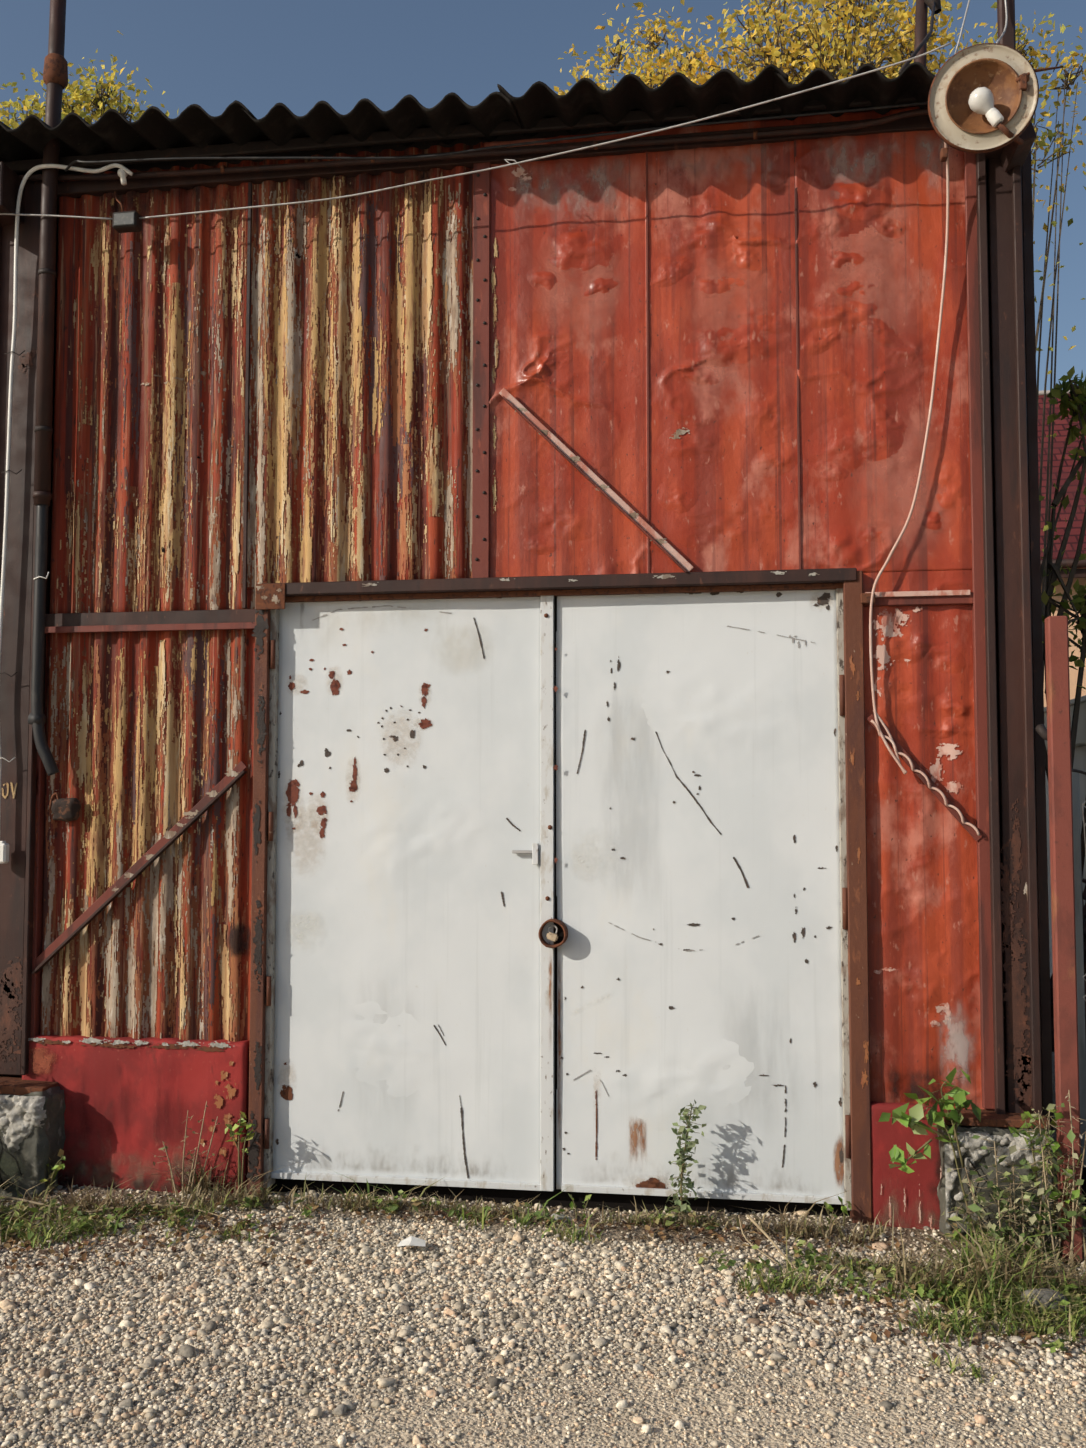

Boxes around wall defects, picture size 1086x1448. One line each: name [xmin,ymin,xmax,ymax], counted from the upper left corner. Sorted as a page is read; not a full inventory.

peeling [491,238,499,384]
peeling [57,168,473,613]
rust [309,659,352,695]
peeling [849,606,923,701]
rust [286,760,327,839]
rust [349,757,358,802]
rust [377,683,432,773]
peeling [926,743,963,794]
peeling [28,629,253,1157]
rust [0,956,23,1069]
peeling [861,1040,869,1089]